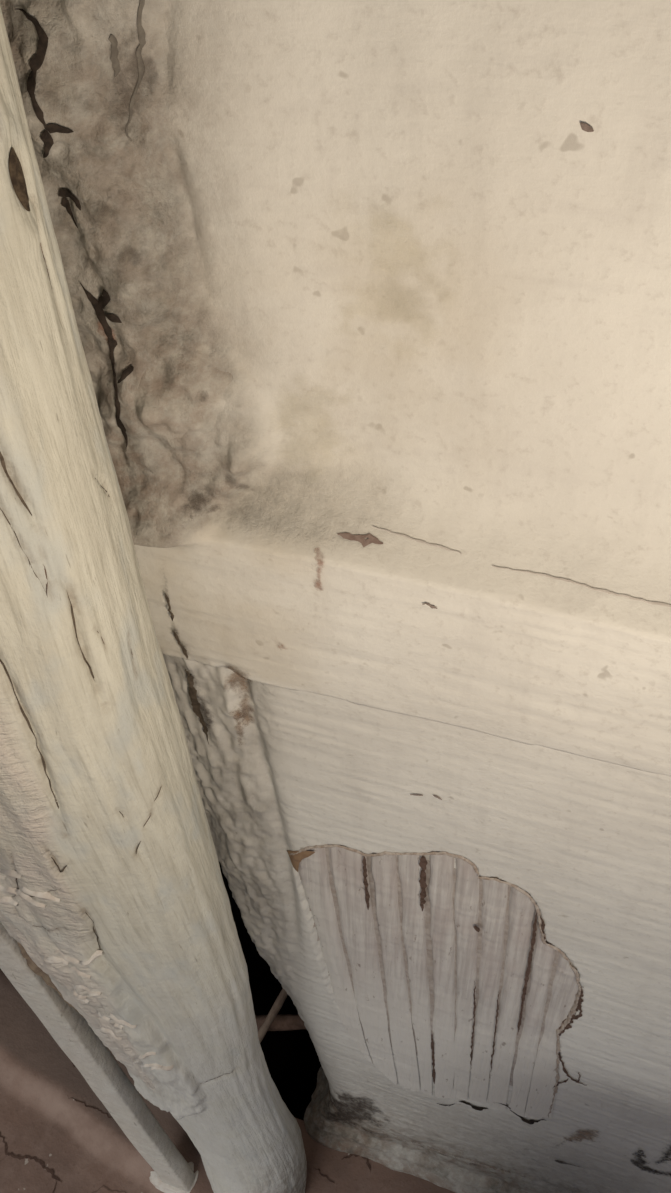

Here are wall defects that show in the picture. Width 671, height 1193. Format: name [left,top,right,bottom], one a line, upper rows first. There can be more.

crack [15,8,74,158]
crack [109,0,146,141]
crack [58,189,81,228]
crack [80,283,134,448]
crack [337,526,462,554]
crack [492,565,671,607]
peeling [0,875,60,908]
spalling [287,844,584,1120]
water stain [327,1091,388,1133]
crack [0,1135,62,1193]